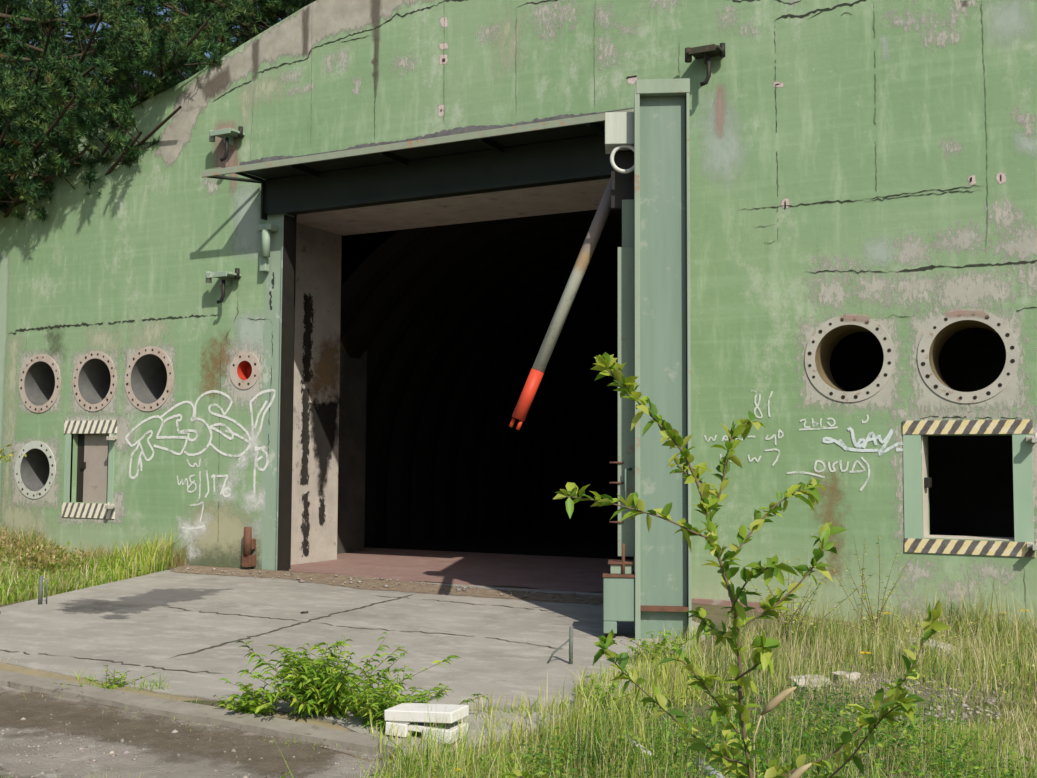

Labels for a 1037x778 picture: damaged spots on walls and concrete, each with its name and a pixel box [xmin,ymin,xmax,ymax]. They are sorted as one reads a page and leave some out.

crack [214,0,463,101]
crack [733,0,866,22]
crack [742,185,983,244]
crack [811,260,1037,273]
crack [8,272,274,457]
water stain [309,343,340,496]